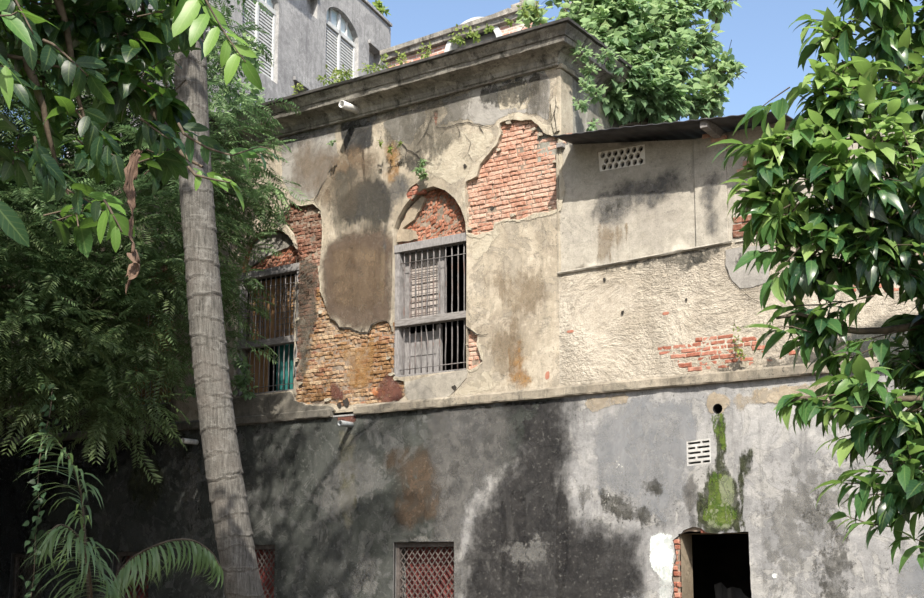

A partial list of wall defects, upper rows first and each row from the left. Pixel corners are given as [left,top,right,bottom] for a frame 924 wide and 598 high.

spalling [281,124,405,407]
spalling [406,184,427,201]
spalling [428,81,572,260]
water stain [593,171,678,260]
spalling [658,334,769,372]
water stain [0,320,224,598]
water stain [236,374,643,598]
spalling [673,527,706,598]